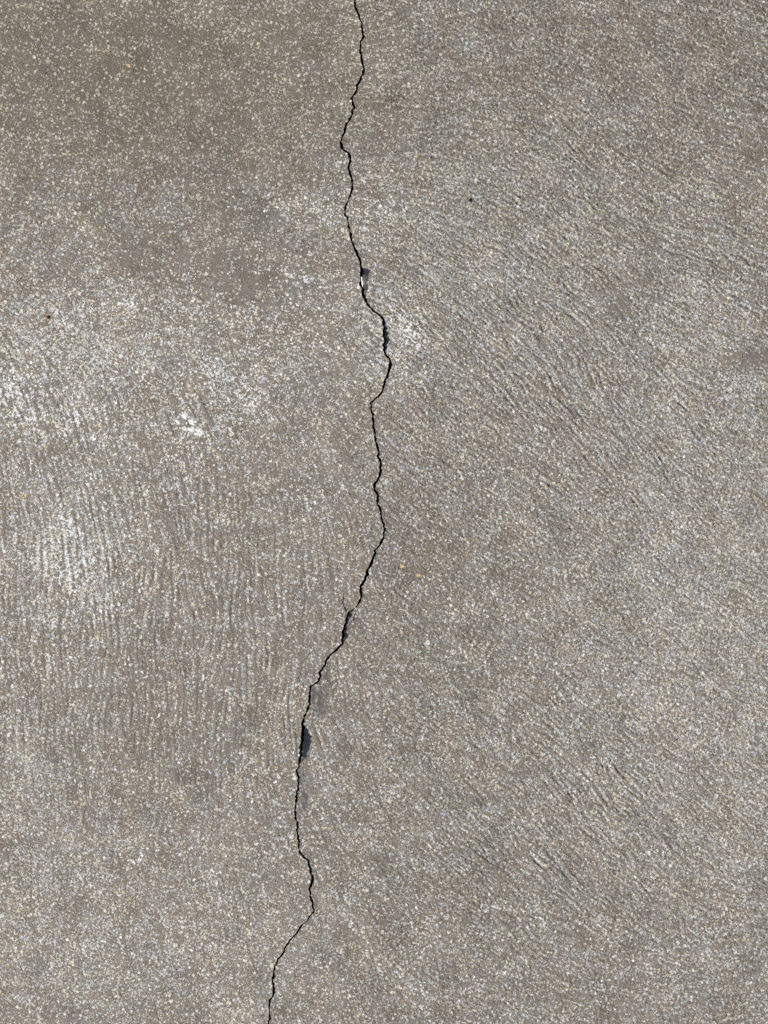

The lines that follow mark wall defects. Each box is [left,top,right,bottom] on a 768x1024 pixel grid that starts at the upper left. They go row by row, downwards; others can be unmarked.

crack [268,0,392,1024]